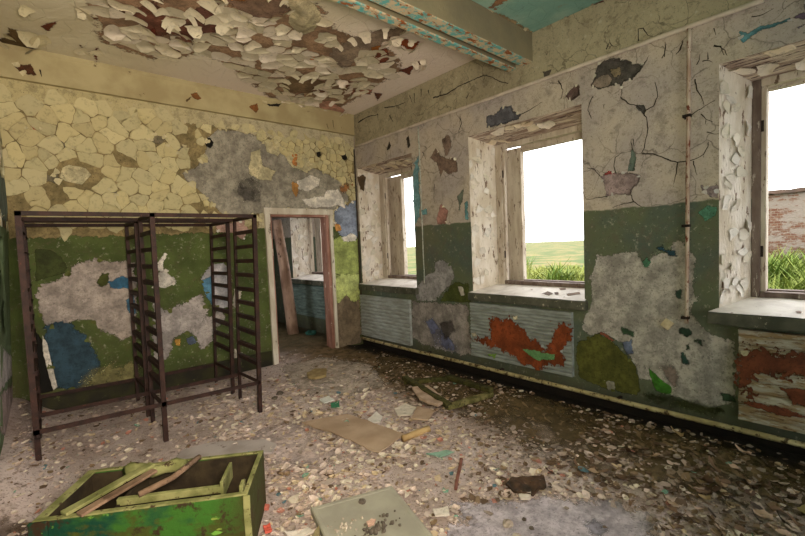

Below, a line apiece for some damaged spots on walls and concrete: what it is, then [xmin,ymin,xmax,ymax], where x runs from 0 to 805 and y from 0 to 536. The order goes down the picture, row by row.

peeling [12,62,36,76]
peeling [0,22,56,54]
flaking render [35,249,138,393]
flaking render [0,83,427,360]
peeling [73,0,427,116]
peeling [283,357,389,398]
peeling [431,135,458,176]
flaking render [411,247,489,357]
peeling [457,105,555,240]
flaking render [576,240,738,407]
crack [588,28,727,182]
peeling [720,220,752,304]